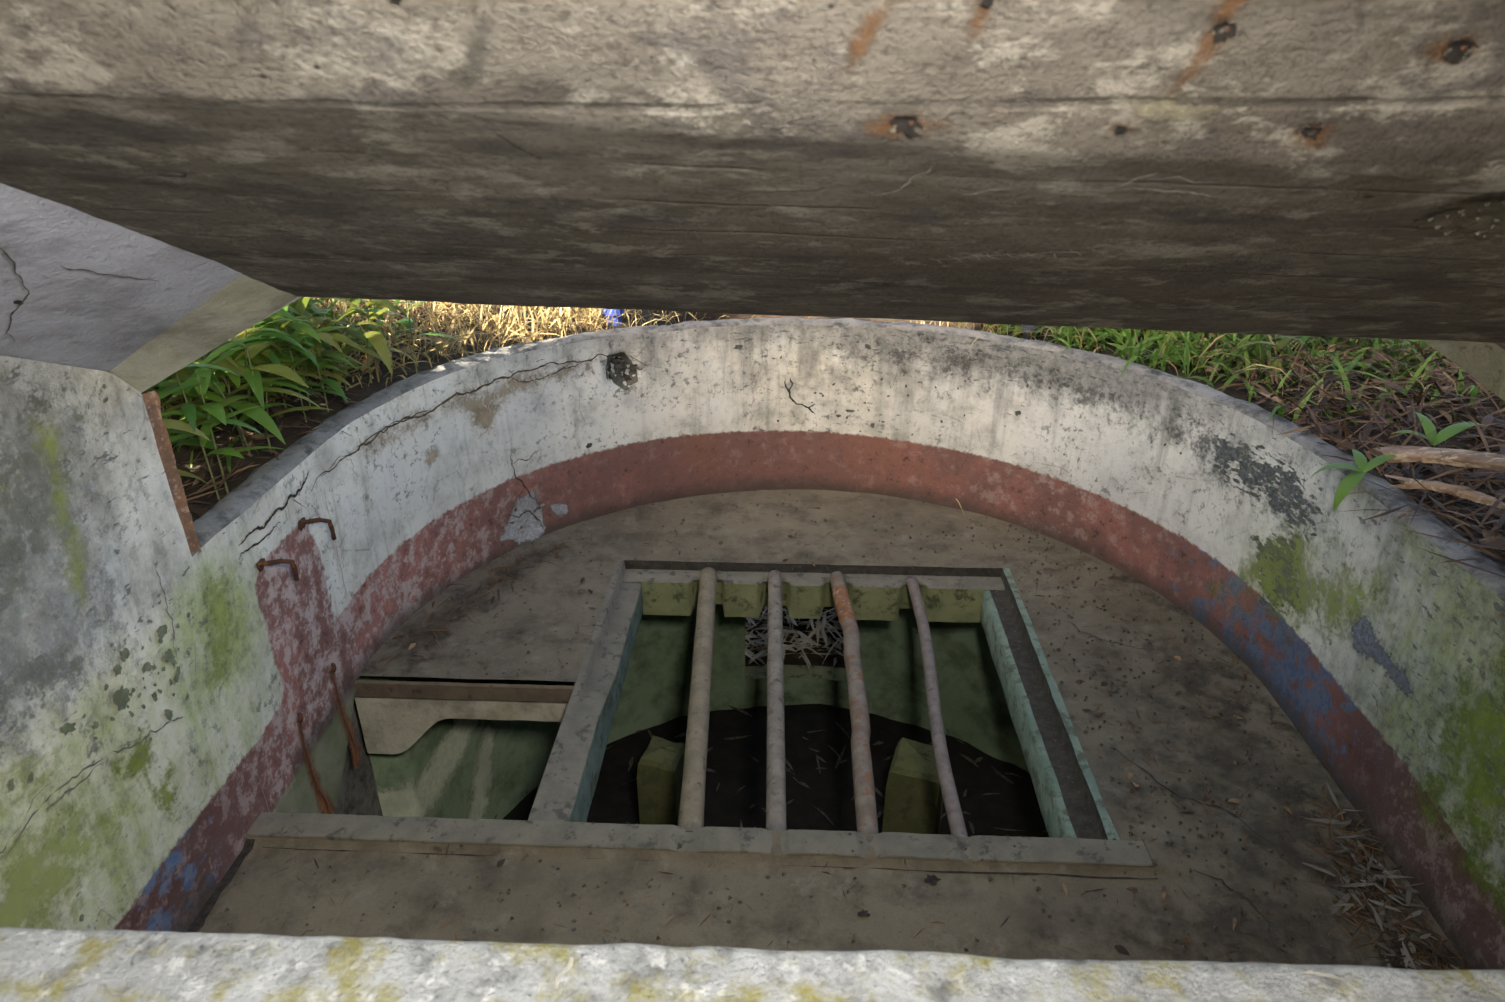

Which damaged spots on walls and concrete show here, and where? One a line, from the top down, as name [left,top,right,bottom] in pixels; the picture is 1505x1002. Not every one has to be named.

crack [0,248,30,342]
crack [61,266,156,281]
crack [239,354,650,601]
spalling [499,490,569,545]
water stain [0,378,126,758]
peeling [1351,616,1414,698]
corrosion [331,663,360,767]
water stain [112,736,177,819]
corrosion [297,712,335,814]